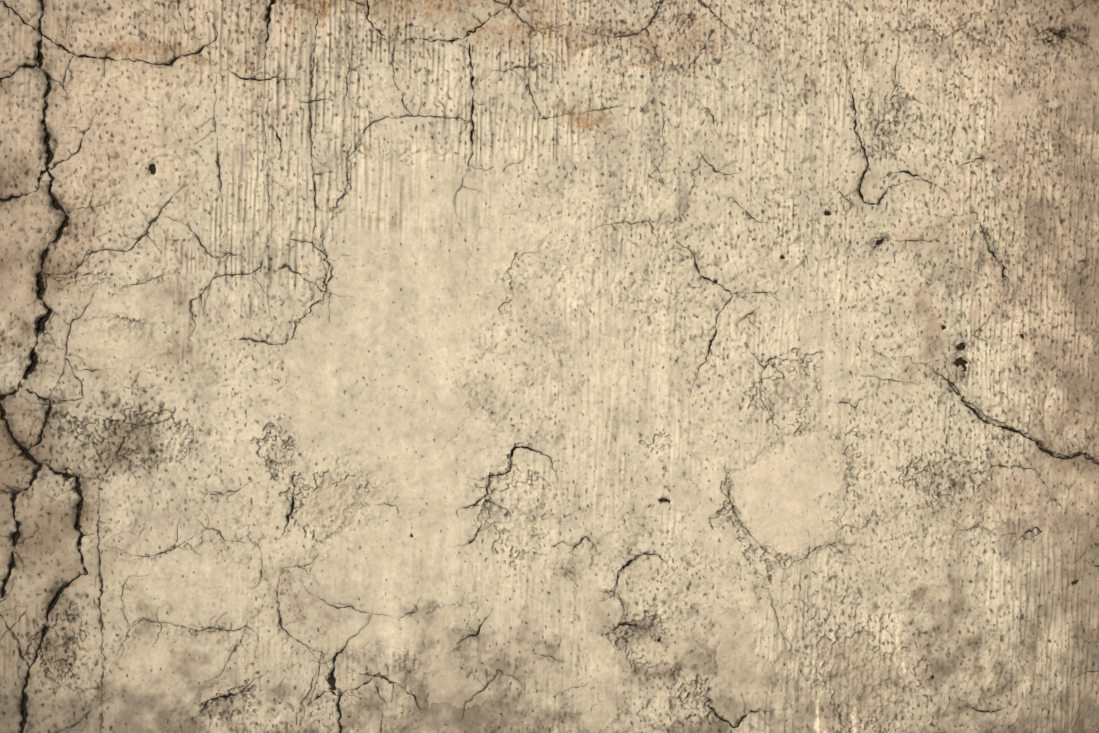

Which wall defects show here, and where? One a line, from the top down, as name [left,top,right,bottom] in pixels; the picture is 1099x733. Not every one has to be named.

crack [581,0,775,237]
peeling [0,450,43,498]
spalling [46,408,193,470]
crack [0,0,618,733]
crack [553,536,669,634]
crack [589,218,793,420]
crack [709,470,845,661]
crack [831,36,1099,497]
crack [704,688,787,728]
crack [964,698,1004,713]